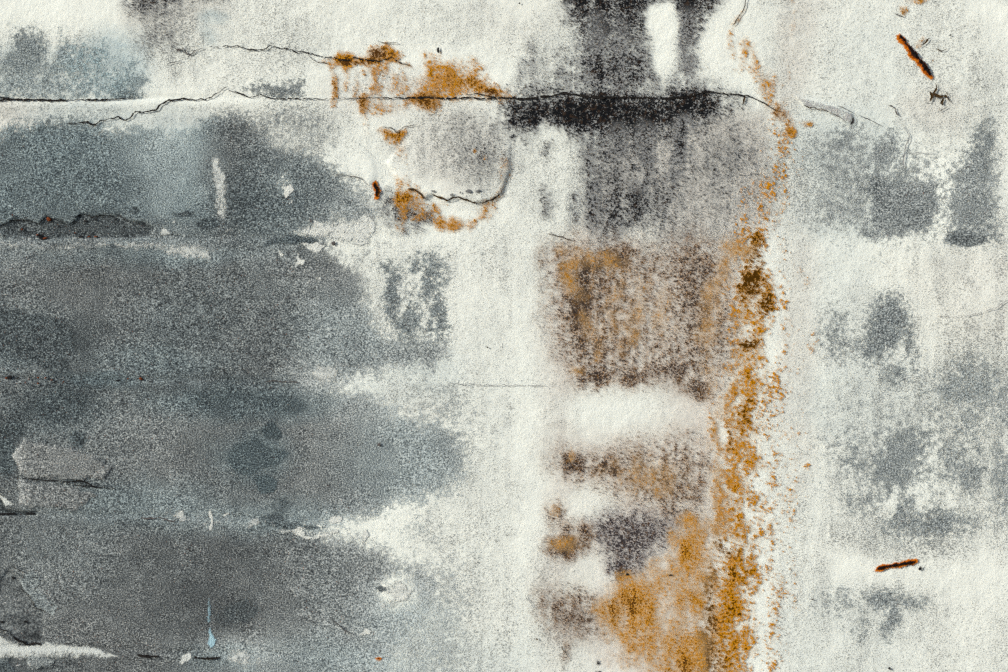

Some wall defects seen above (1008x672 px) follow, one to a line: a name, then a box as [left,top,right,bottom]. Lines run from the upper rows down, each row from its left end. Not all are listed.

leakage [117,0,229,57]
crack [167,41,410,66]
crack [0,87,775,125]
rust [322,42,515,165]
leakage [1,158,232,260]
leakage [260,234,318,248]
rust [393,157,510,234]
leakage [440,0,783,404]
leakage [0,309,75,375]
peeling [0,22,498,672]
rust [558,247,671,361]
rust [592,11,819,672]